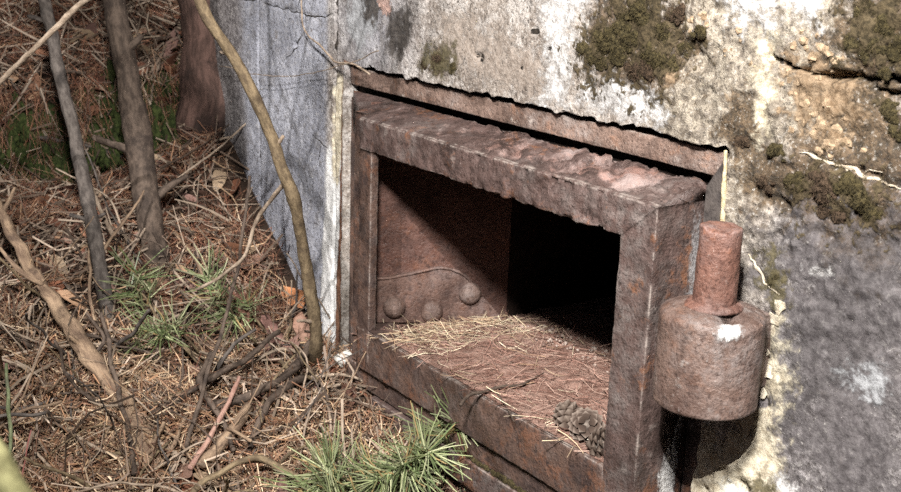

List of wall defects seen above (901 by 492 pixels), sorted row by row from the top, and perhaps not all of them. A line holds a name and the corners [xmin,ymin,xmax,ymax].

water stain [433,0,671,129]
crack [799,152,900,189]